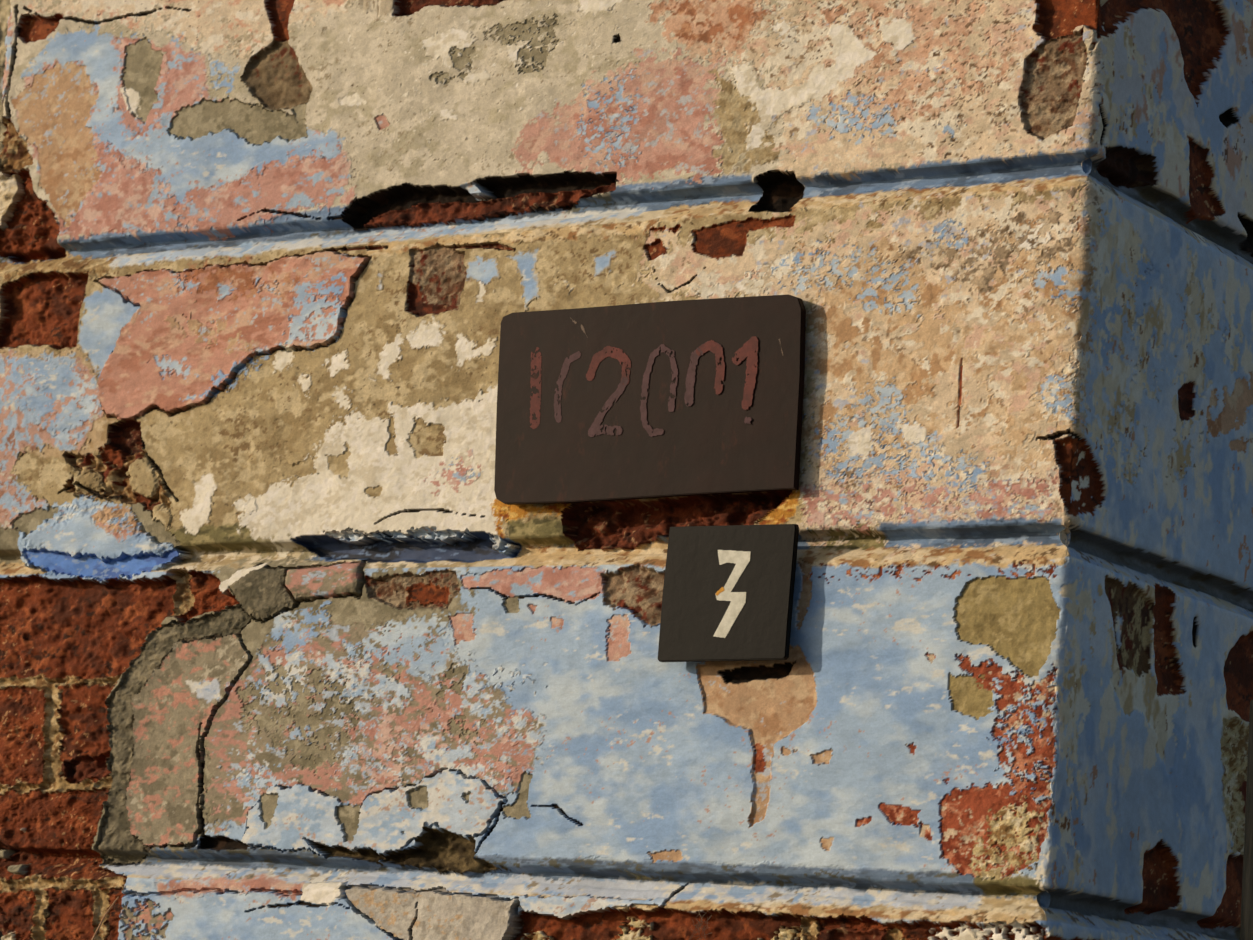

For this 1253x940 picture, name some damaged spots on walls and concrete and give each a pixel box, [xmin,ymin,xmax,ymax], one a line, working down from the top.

peeling [732,12,918,150]
spalling [1018,0,1232,139]
hole [1097,145,1160,188]
spalling [1187,136,1253,257]
spalling [1219,107,1240,127]
peeling [0,0,642,534]
spalling [1105,574,1186,774]
crack [197,722,205,832]
spalling [1197,631,1253,929]
spalling [1124,838,1182,914]